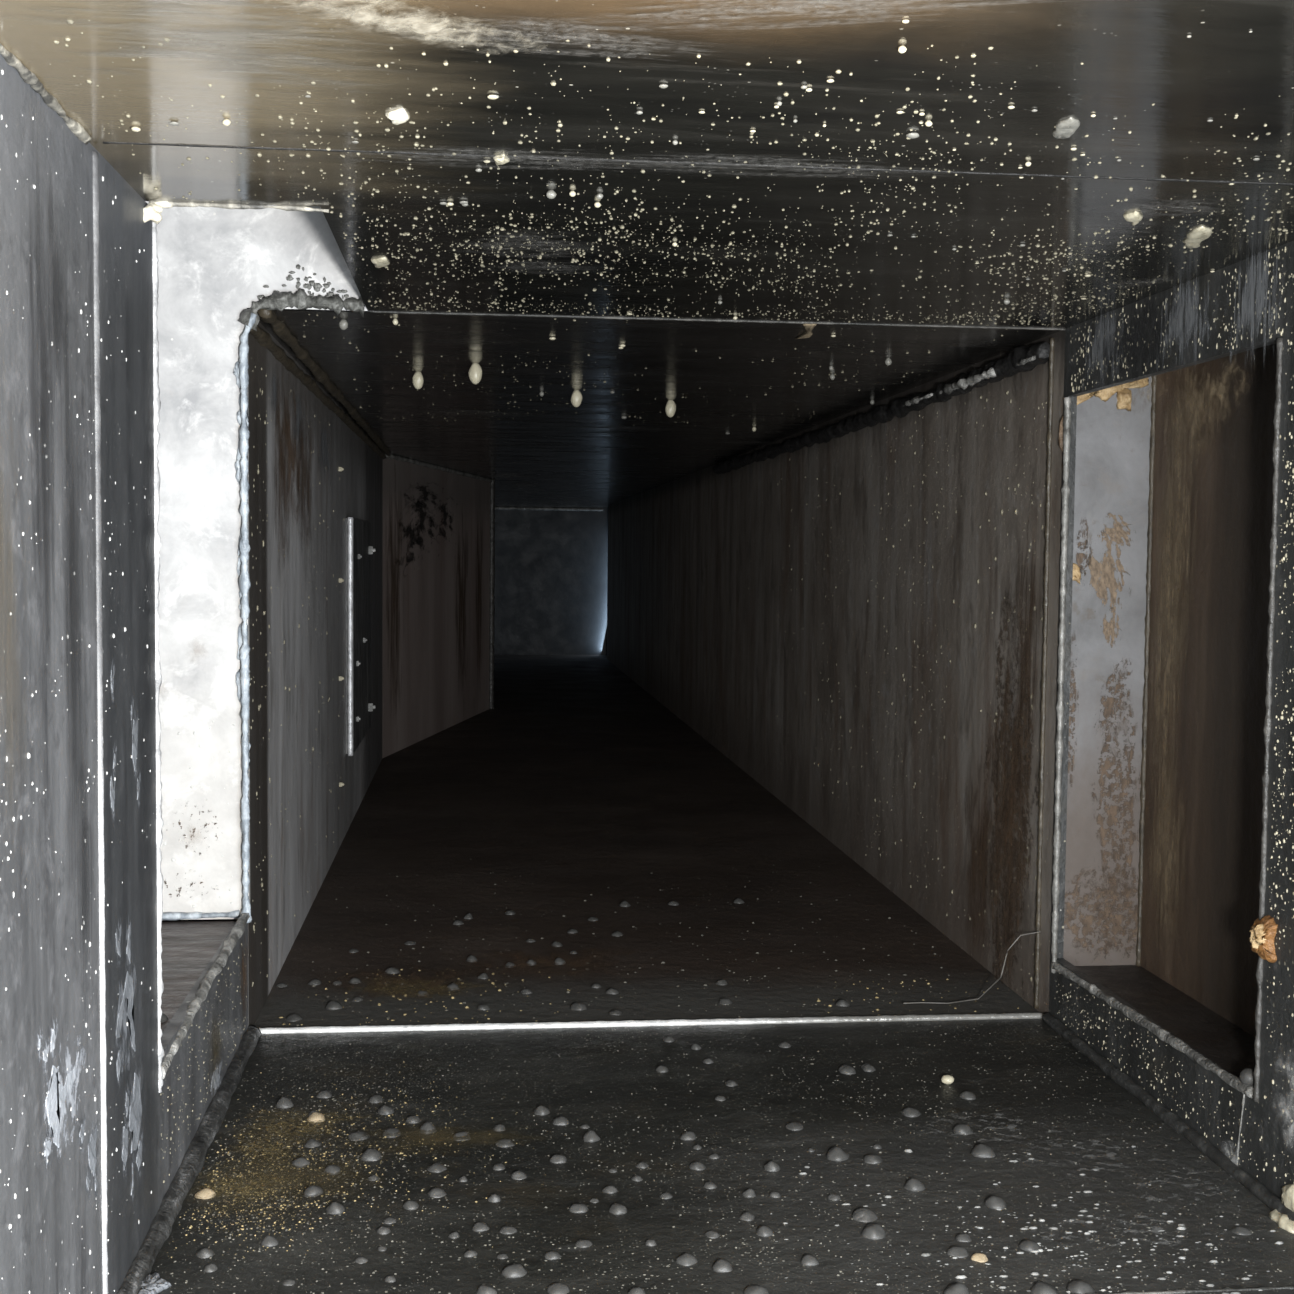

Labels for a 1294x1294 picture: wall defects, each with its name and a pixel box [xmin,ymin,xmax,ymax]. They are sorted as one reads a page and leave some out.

rust [1076,513,1134,648]
rust [1064,661,1141,956]
peeling [37,1020,99,1198]
peeling [115,918,145,1197]